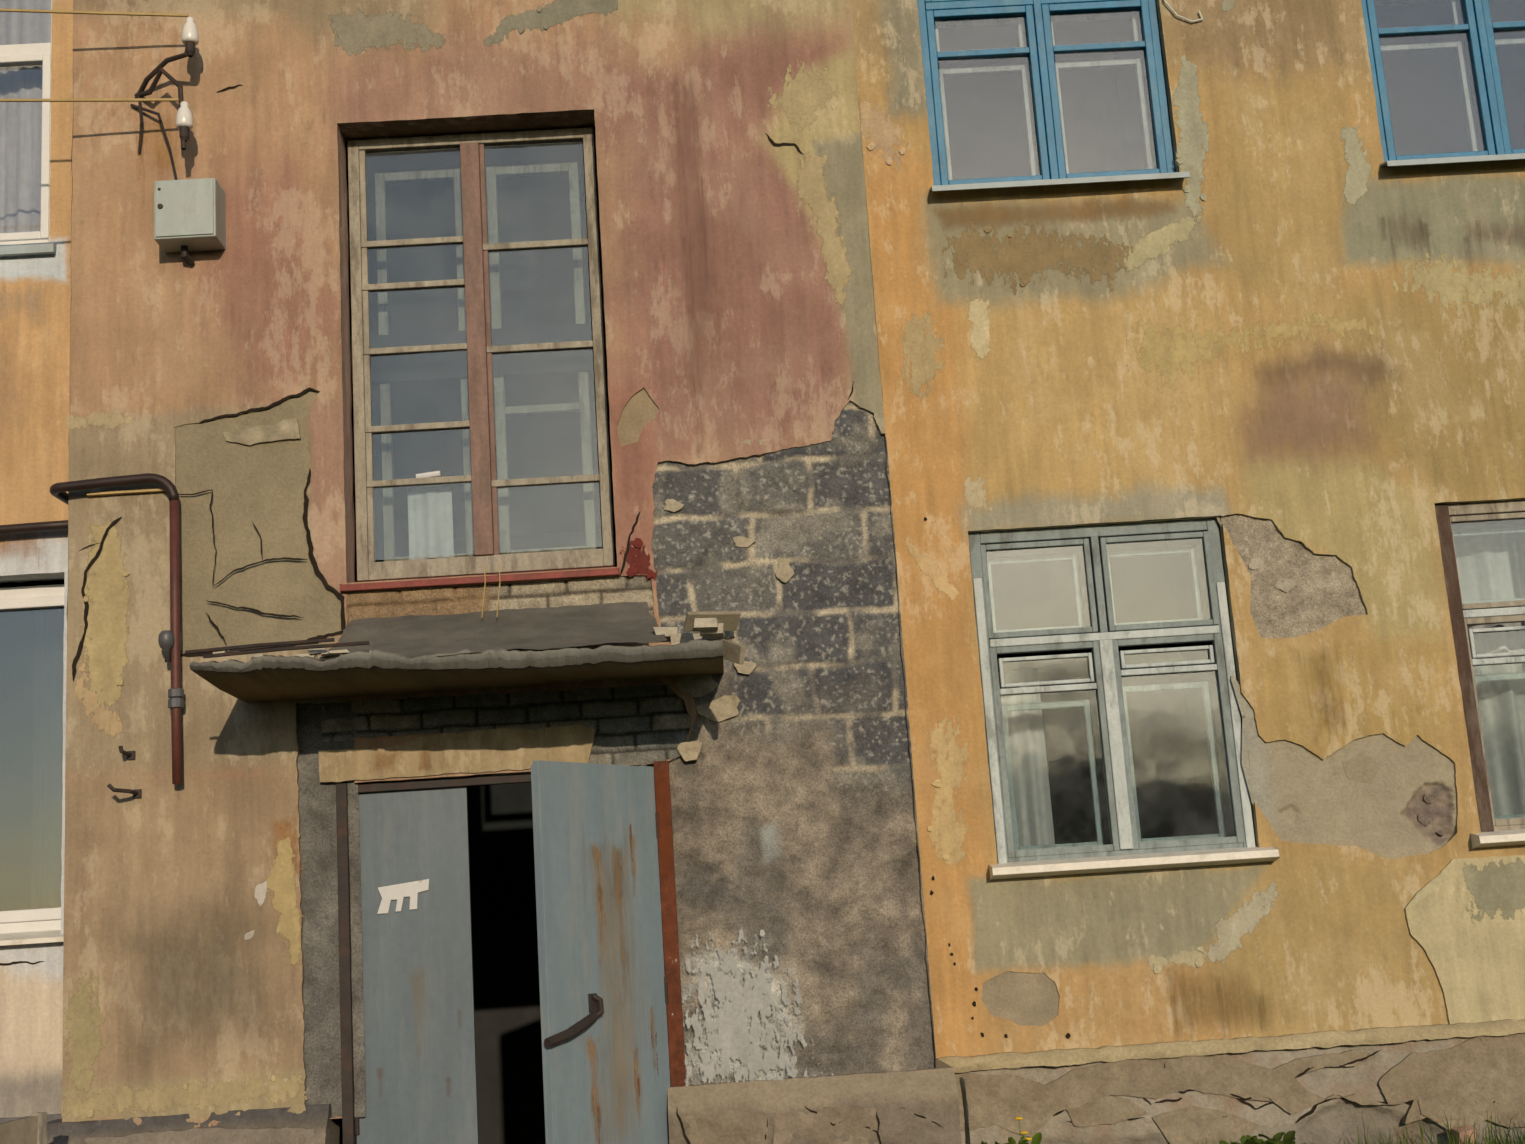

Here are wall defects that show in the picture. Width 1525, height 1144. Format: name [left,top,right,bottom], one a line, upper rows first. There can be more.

peeling [483,0,618,47]
peeling [797,150,853,314]
peeling [942,54,1209,359]
crack [72,517,121,682]
peeling [73,519,133,737]
spalling [1216,514,1366,638]
spalling [175,388,972,1117]
spalling [1231,675,1457,859]
rust [593,825,635,934]
spalling [84,1127,314,1144]
spalling [971,971,1059,1038]
crack [1127,1050,1428,1123]